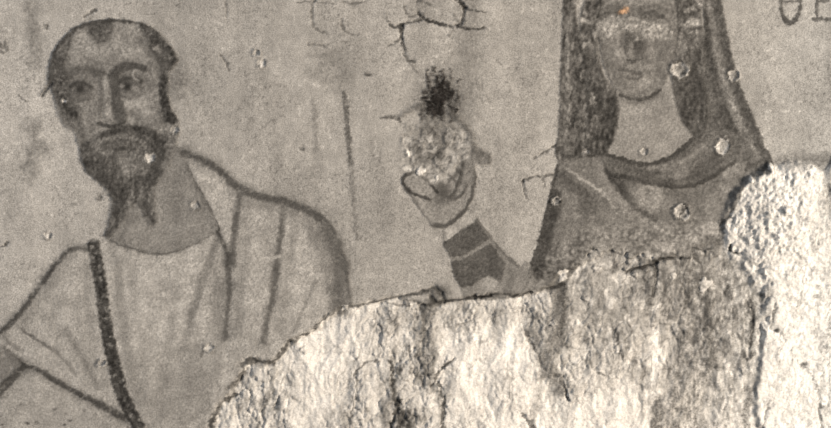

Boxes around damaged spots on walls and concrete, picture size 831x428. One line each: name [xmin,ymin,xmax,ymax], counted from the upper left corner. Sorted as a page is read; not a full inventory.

crack [388,0,486,70]
peeling [671,63,690,79]
spalling [402,122,473,183]
peeling [716,139,729,155]
peeling [674,203,690,221]
spalling [214,248,762,428]